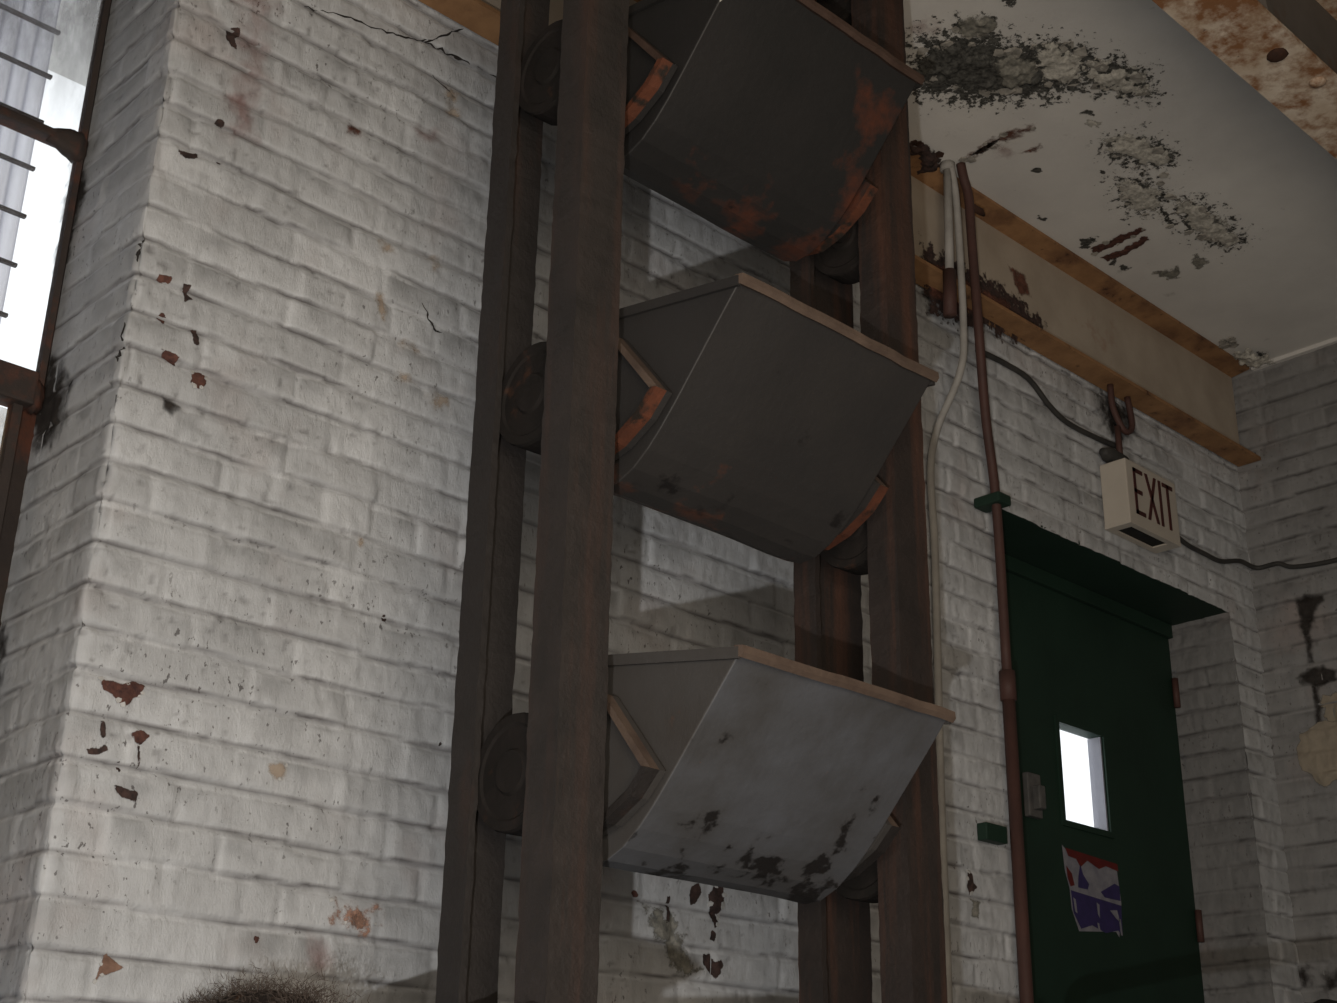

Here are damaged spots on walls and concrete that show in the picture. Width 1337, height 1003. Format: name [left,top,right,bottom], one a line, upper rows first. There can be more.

crack [304,6,496,99]
rust [1079,228,1149,266]
peeling [156,274,193,302]
crack [422,303,442,333]
peeling [162,349,179,366]
peeling [190,370,208,389]
peeling [164,398,179,413]
peeling [97,676,145,707]
peeling [87,721,149,802]
peeling [631,883,727,979]
spalling [92,954,123,984]